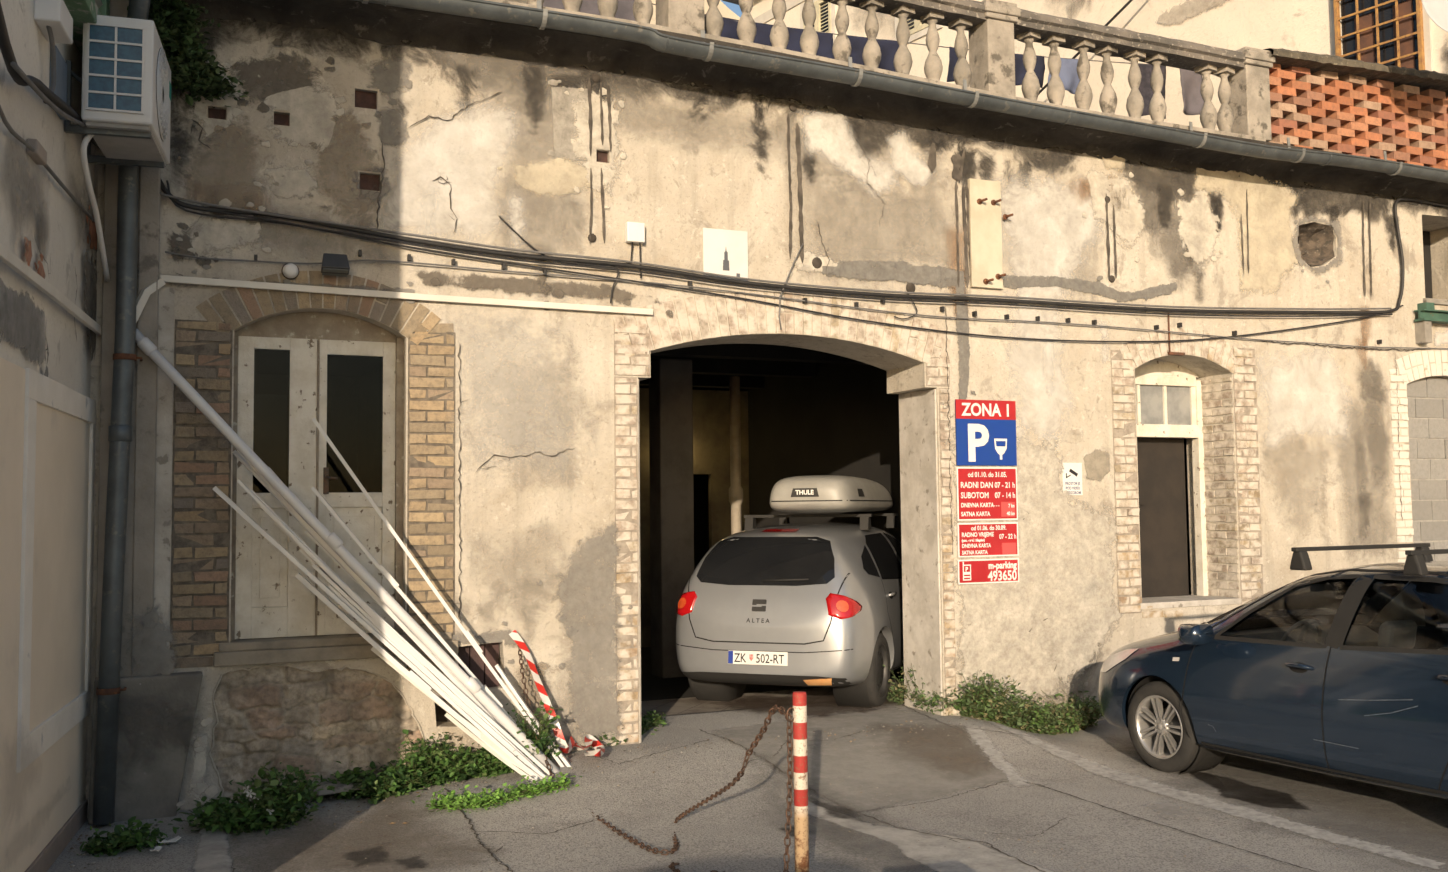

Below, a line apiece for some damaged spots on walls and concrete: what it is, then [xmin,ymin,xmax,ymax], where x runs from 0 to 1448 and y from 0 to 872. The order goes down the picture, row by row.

water stain [170,80,196,165]
peeling [168,39,412,286]
water stain [180,11,1099,445]
water stain [1122,160,1223,299]
peeling [1175,168,1343,293]
crack [455,347,573,621]
crack [444,788,603,872]